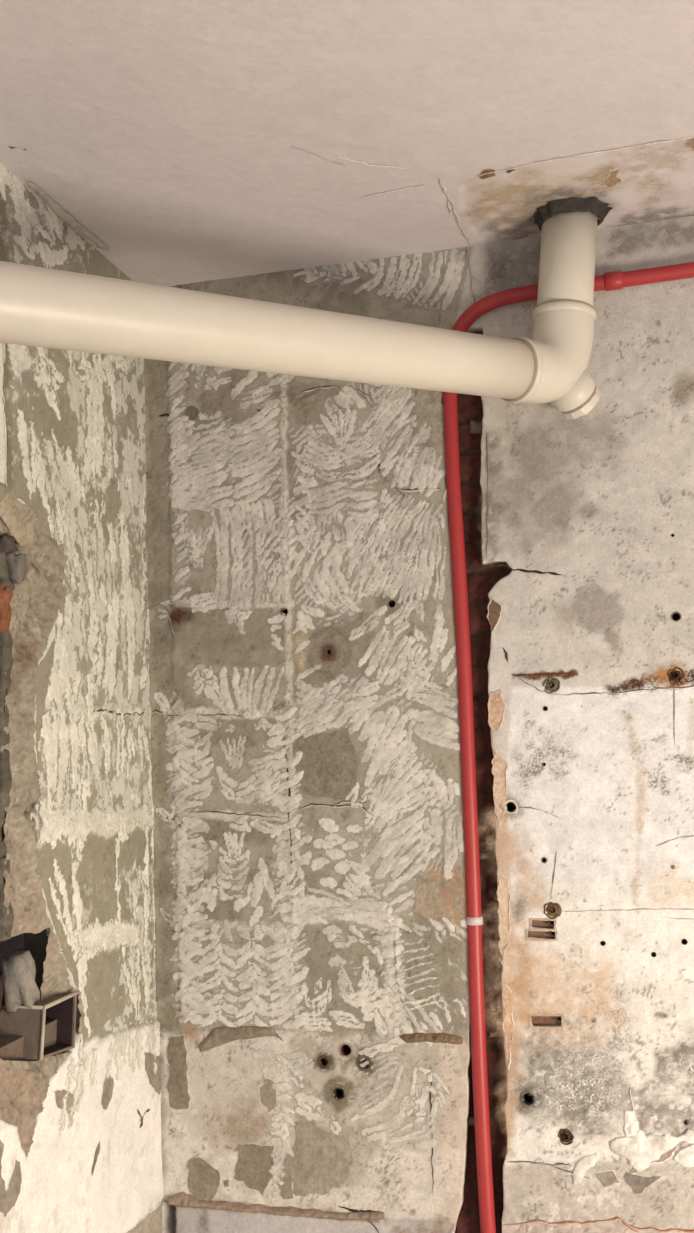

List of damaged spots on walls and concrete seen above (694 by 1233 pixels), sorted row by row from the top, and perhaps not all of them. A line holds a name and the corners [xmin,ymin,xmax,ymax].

rust [514,670,578,680]
rust [608,669,694,695]
flaking render [0,482,85,1034]
flaking render [4,1052,80,1128]
peeling [100,1076,114,1111]
peeling [0,1139,22,1218]
peeling [127,1201,163,1233]
crack [502,1216,694,1233]